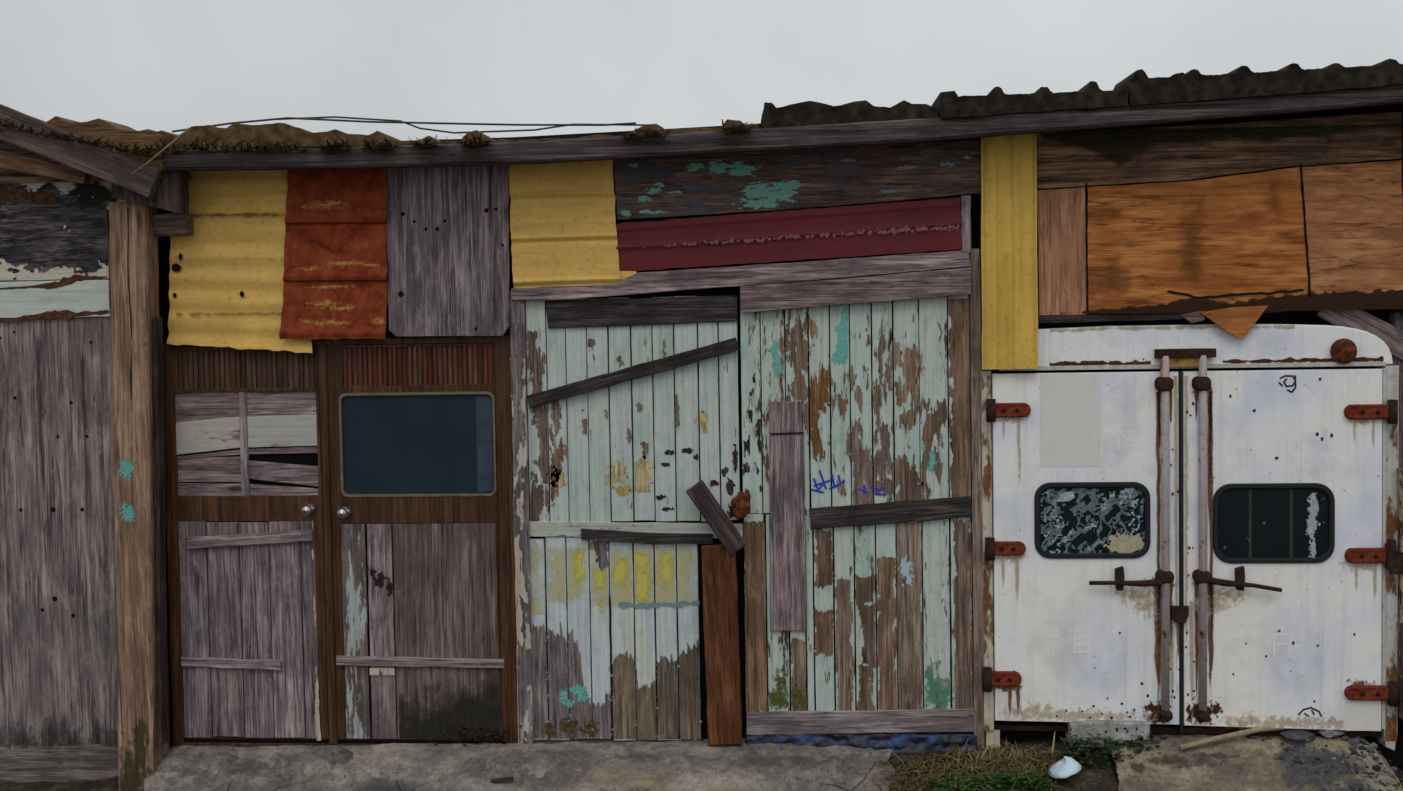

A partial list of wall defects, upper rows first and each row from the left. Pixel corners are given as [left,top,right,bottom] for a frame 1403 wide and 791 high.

peeling [0,182,108,280]
peeling [687,159,802,210]
peeling [772,298,971,505]
corrosion [982,417,1021,499]
peeling [509,293,702,744]
peeling [710,373,767,712]
peeling [791,522,923,711]
corrosion [983,553,1021,656]
corrosion [992,376,1337,746]
corrosion [1353,563,1397,595]
corrosion [1386,497,1397,548]
leakage [399,685,500,739]